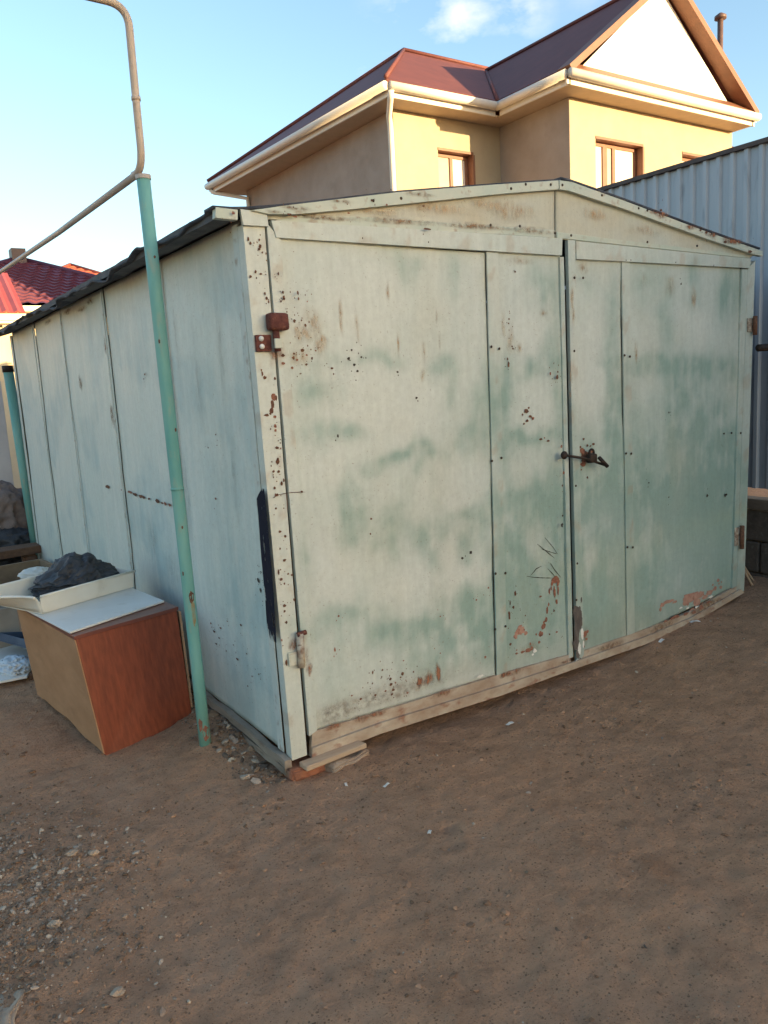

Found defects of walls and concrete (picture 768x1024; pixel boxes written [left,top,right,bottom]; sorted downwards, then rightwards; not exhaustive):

corrosion [539,576,560,604]
peeling [508,591,584,661]
corrosion [418,666,449,695]